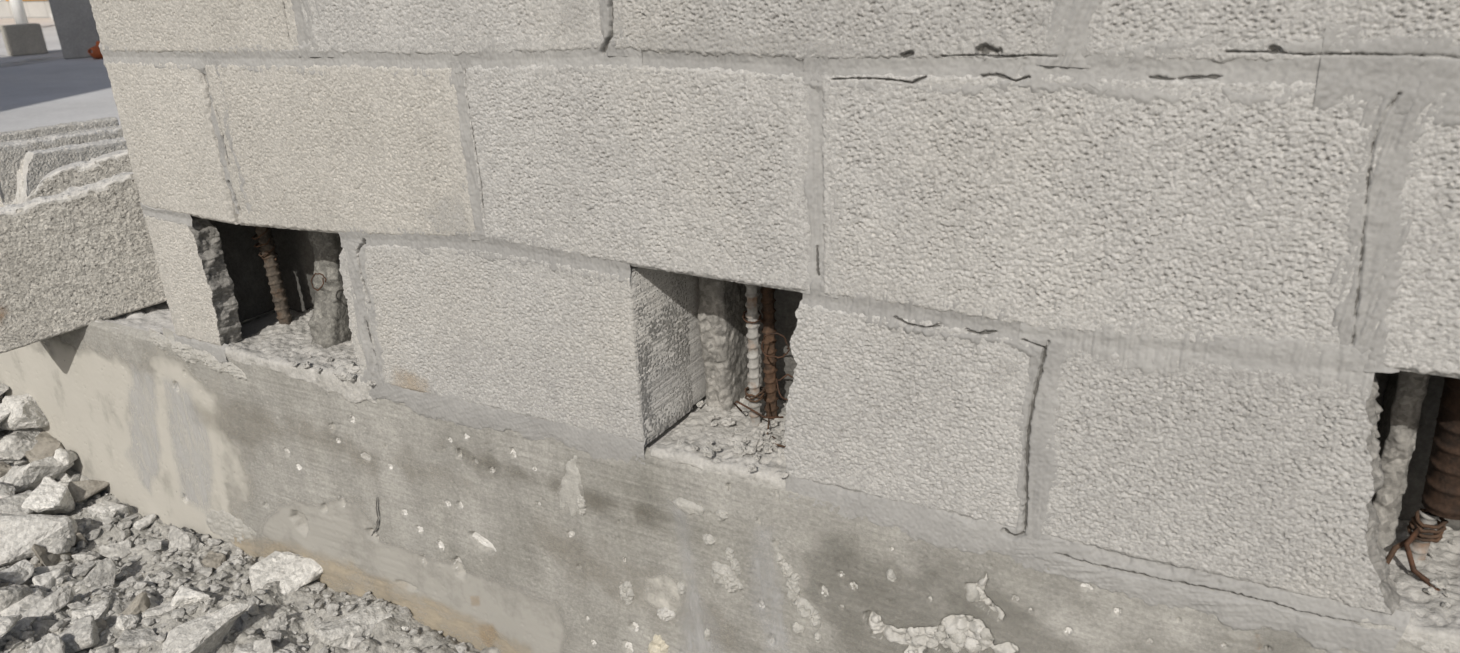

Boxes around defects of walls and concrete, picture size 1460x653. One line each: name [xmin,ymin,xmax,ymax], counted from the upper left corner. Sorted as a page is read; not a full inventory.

crack [834,54,1043,84]
crack [1150,51,1365,80]
spalling [149,218,377,443]
spalling [649,277,793,501]
crack [895,317,1049,348]
crack [1352,142,1374,343]
spalling [1353,371,1460,653]